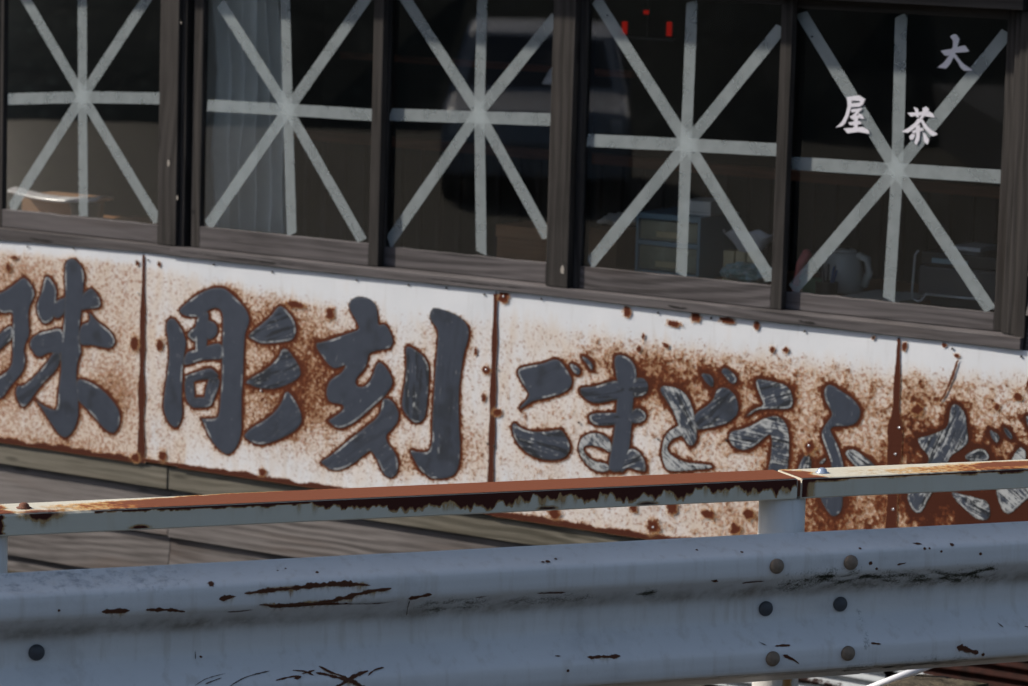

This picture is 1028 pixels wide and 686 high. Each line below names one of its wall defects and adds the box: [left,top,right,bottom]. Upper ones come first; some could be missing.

rust [0,255,1028,540]